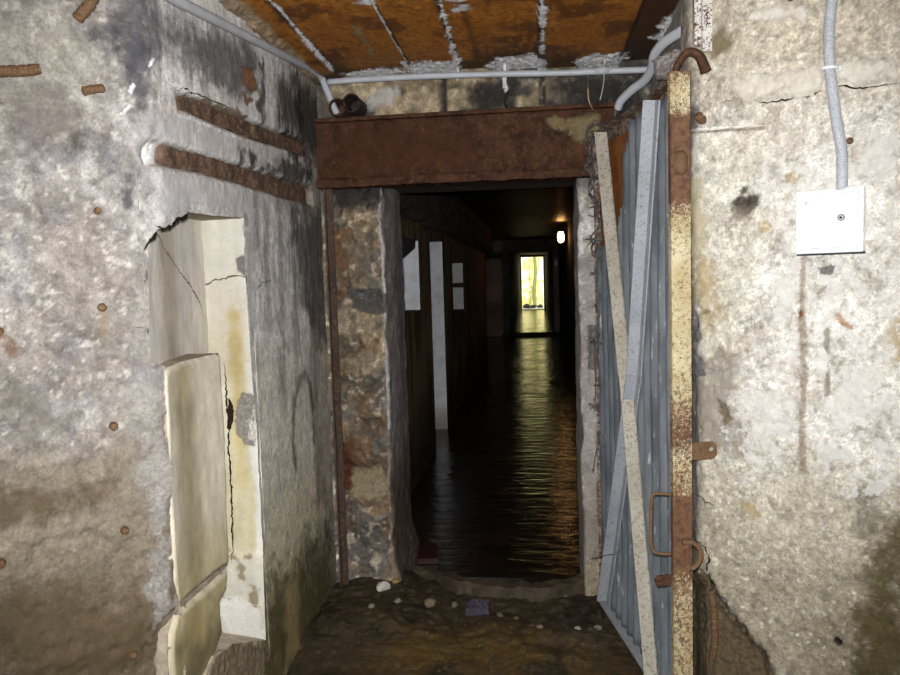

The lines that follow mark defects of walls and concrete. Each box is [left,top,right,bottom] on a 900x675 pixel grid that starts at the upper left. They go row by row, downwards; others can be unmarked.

leakage [94,0,266,124]
spalling [184,66,259,119]
leakage [237,71,318,183]
crack [718,82,900,104]
leakage [733,187,759,220]
crack [143,211,271,322]
spalling [235,393,256,446]
crack [161,366,234,622]
spalling [692,571,774,675]